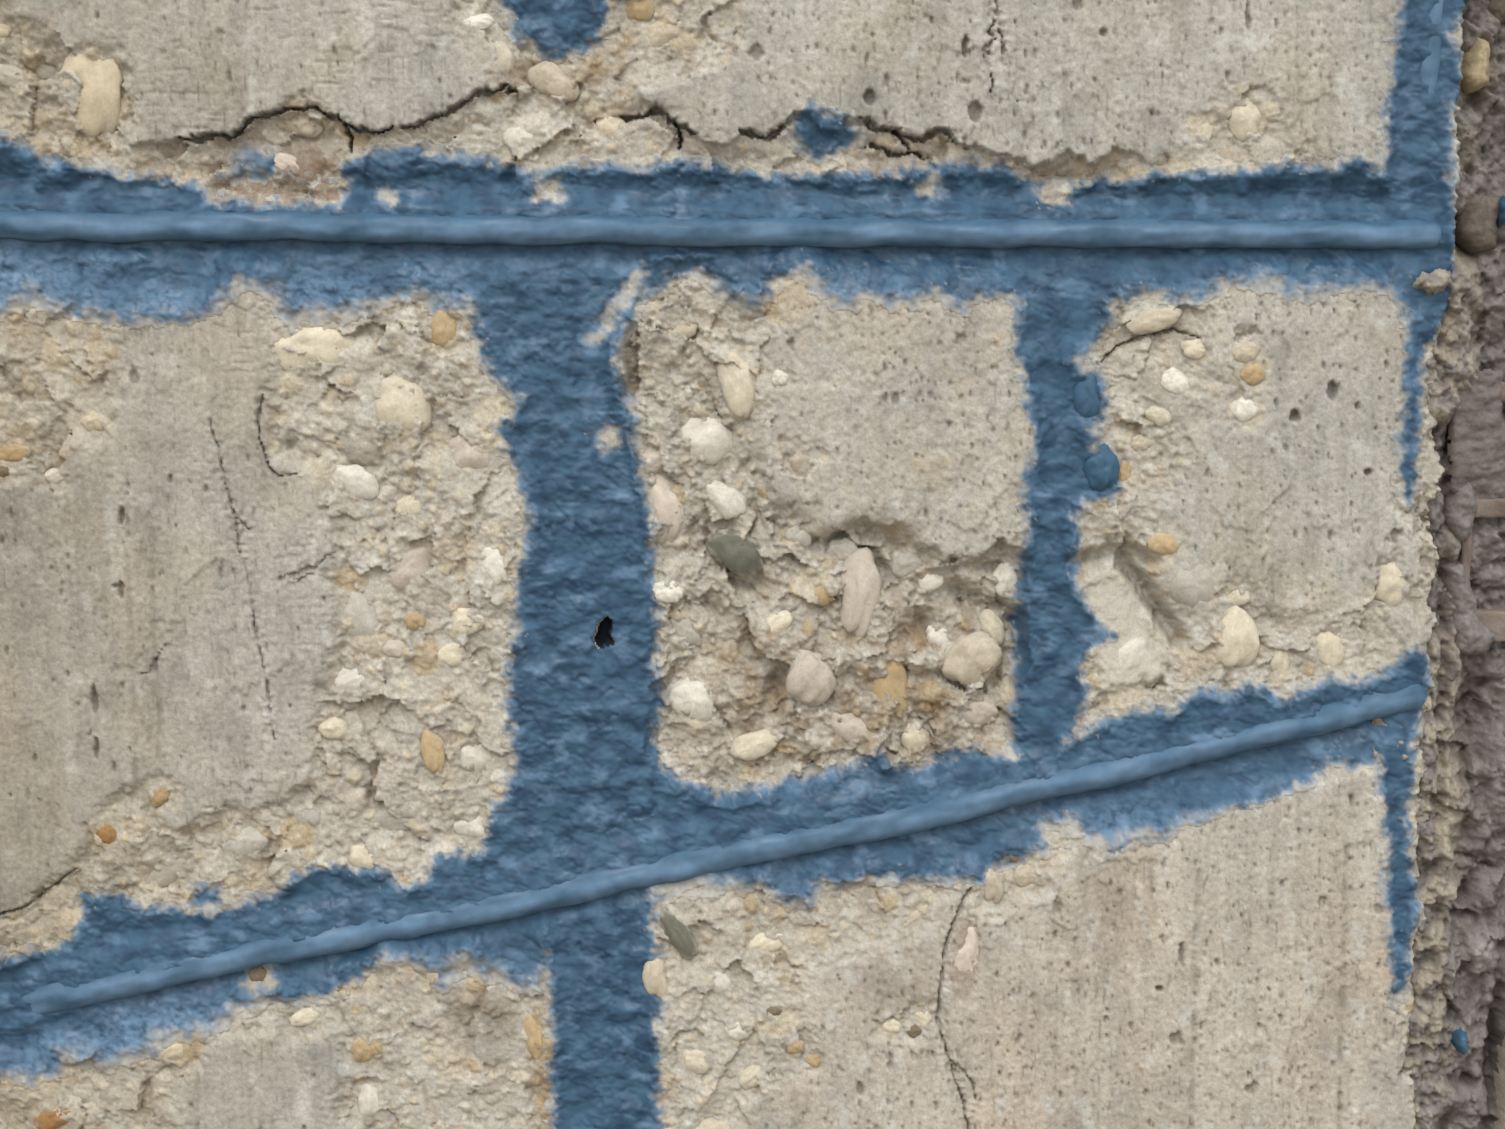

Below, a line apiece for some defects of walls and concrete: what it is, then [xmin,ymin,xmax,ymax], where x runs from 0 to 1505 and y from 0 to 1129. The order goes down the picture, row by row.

crack [181,85,519,149]
crack [618,106,697,150]
spalling [0,0,1340,202]
crack [739,121,788,143]
crack [865,120,959,160]
spalling [0,295,524,963]
spalling [618,276,1020,791]
spalling [1077,290,1445,725]
spalling [1411,681,1435,877]
spalling [0,962,549,1129]
crack [936,884,979,1129]
spalling [1397,901,1427,1124]